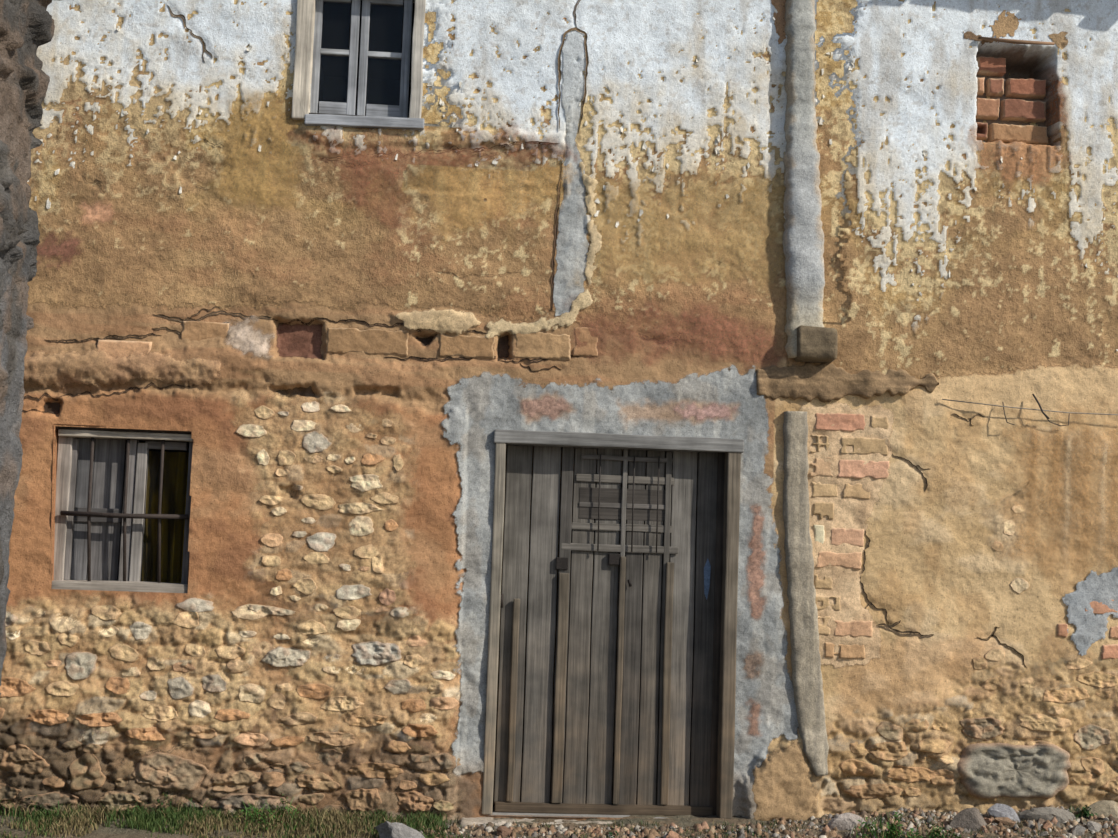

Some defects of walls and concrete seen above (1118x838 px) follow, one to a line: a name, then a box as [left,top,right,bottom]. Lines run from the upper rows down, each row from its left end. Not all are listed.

crack [168,6,212,61]
peeling [27,0,1118,379]
crack [44,305,579,372]
crack [23,382,194,412]
crack [892,453,929,491]
spalling [800,402,894,668]
crack [860,530,934,638]
crack [978,627,1027,668]
spalling [828,638,1118,808]